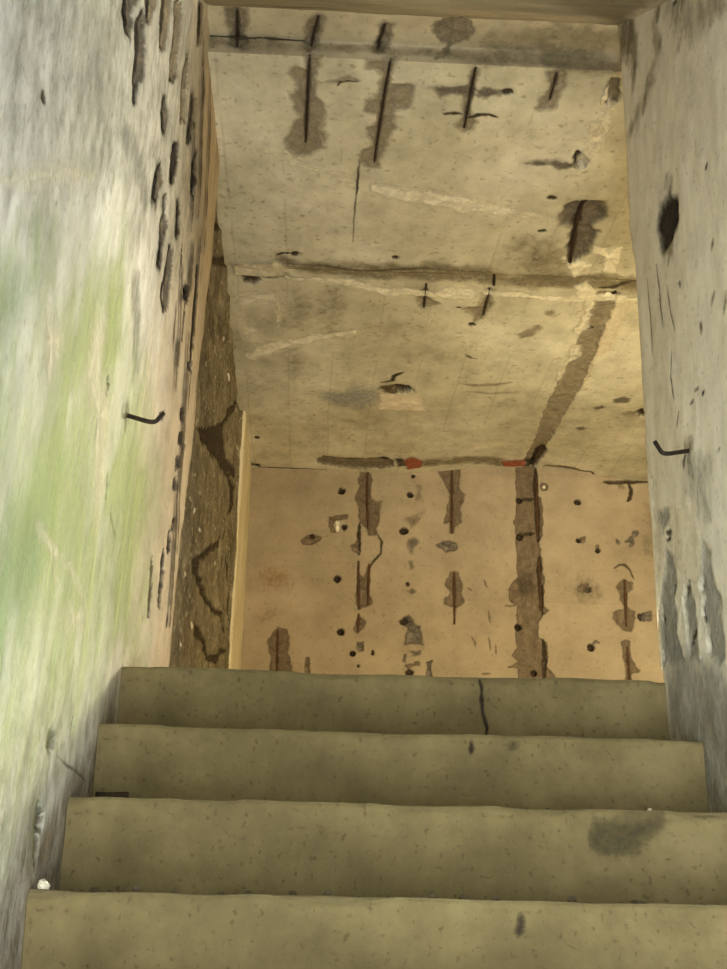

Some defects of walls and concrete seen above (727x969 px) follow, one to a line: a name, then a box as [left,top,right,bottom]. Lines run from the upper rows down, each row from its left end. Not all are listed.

spalling [122,0,197,313]
spalling [285,15,326,155]
spalling [360,22,414,167]
spalling [443,67,513,131]
crack [147,35,324,663]
spalling [301,456,424,545]
spalling [436,469,464,552]
spalling [496,200,620,679]
spalling [267,627,292,671]
crack [469,680,488,754]
peeling [613,508,724,680]